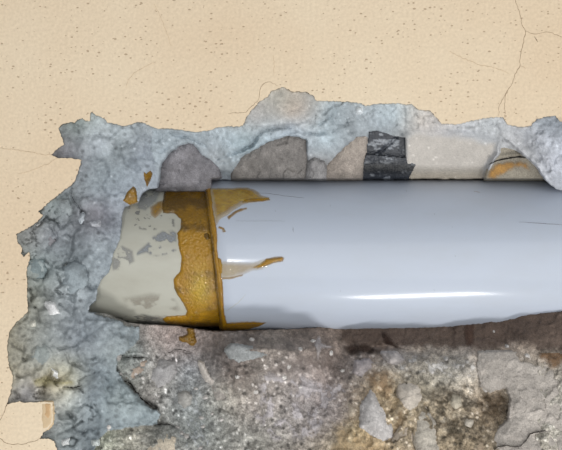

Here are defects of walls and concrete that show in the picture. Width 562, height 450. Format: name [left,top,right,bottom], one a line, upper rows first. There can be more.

crack [450,0,561,110]
rust [489,163,527,178]
spalling [7,87,562,450]